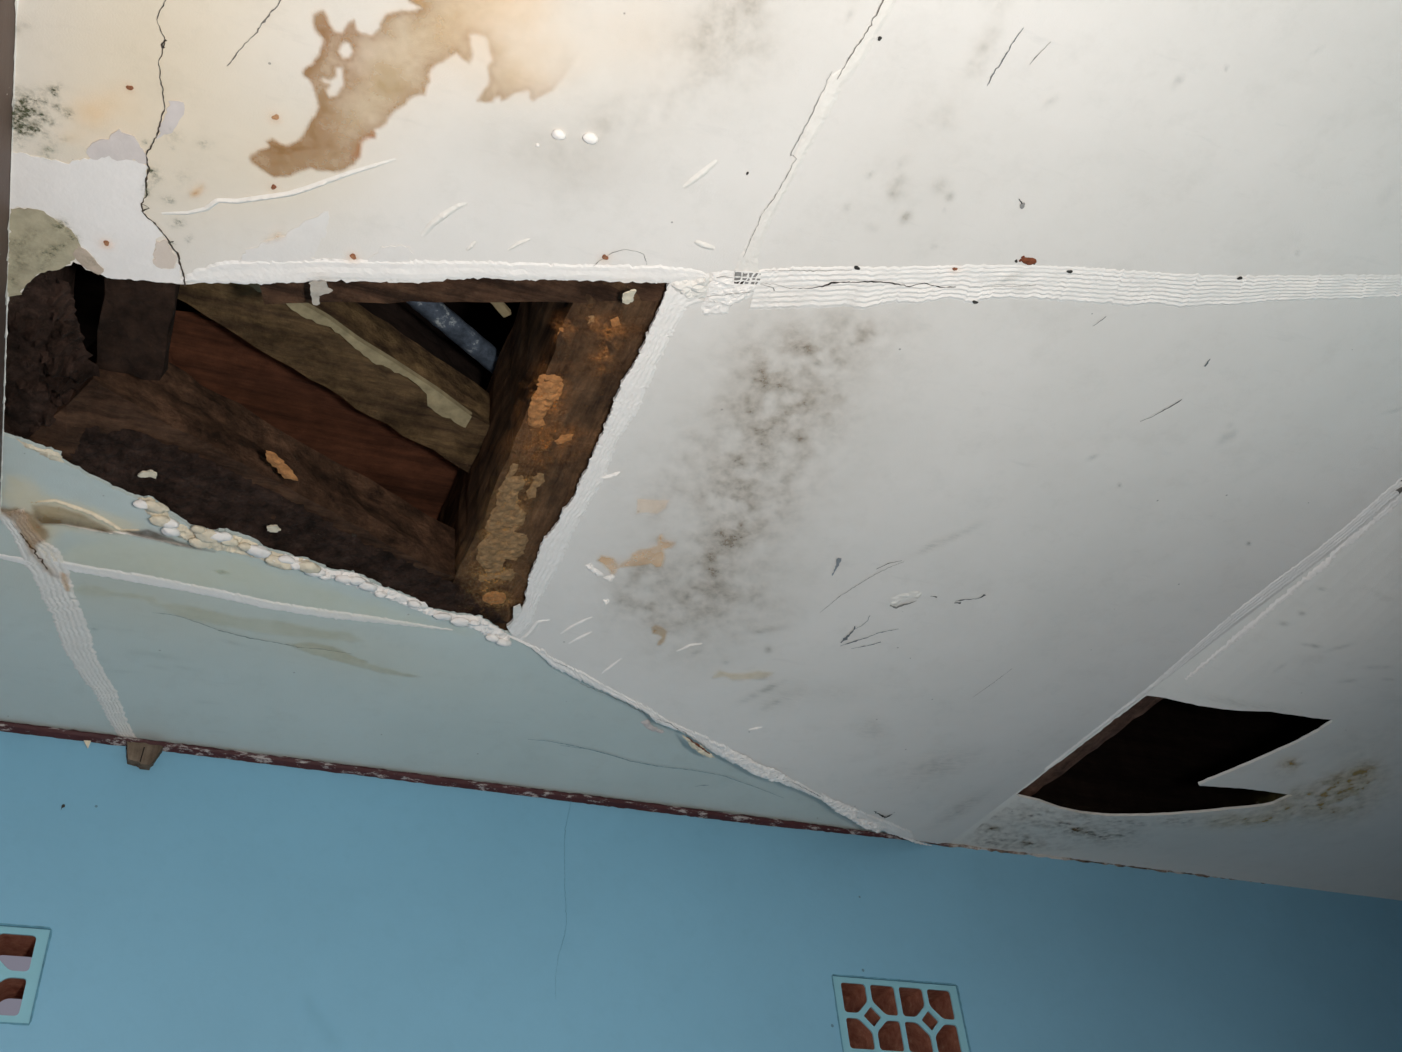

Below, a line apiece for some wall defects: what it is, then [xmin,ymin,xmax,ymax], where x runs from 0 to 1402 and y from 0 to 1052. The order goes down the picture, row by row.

crack [227,0,281,66]
damp [252,0,466,176]
crack [141,0,186,286]
crack [707,0,954,302]
peeling [72,245,104,275]
flaking render [309,280,333,305]
flaking render [622,289,636,304]
flaking render [137,470,157,479]
spalling [133,497,522,647]
peeling [585,563,615,581]